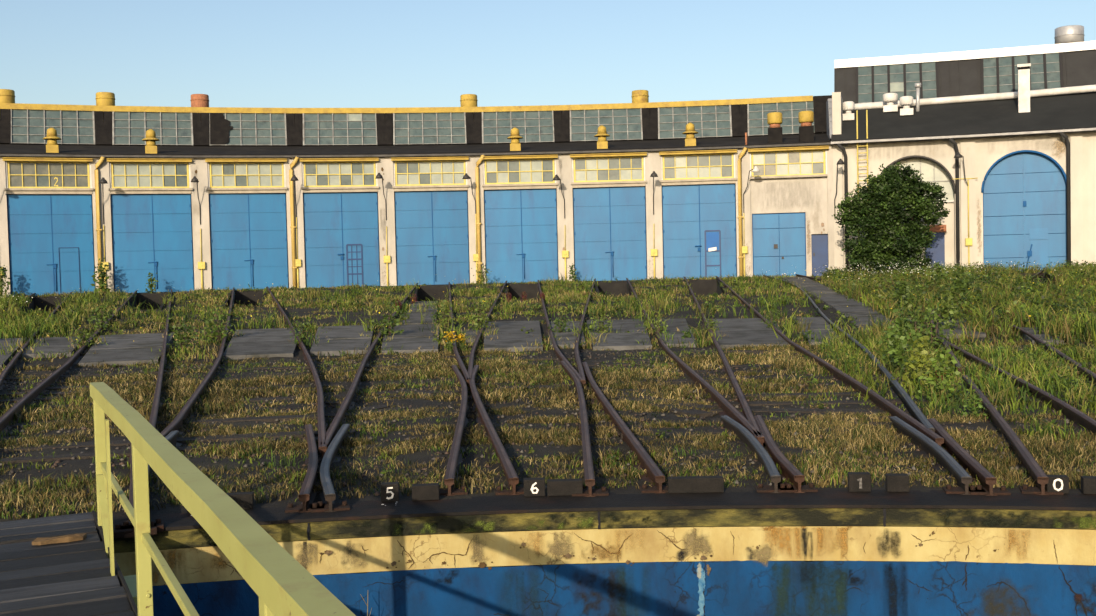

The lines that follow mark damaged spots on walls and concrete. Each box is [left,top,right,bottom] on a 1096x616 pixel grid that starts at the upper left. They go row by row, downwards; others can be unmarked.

damp [297,542,317,569]
crack [365,540,472,590]
crack [574,530,706,616]
peeling [695,554,713,616]
damp [885,567,906,616]
crack [1054,544,1090,616]